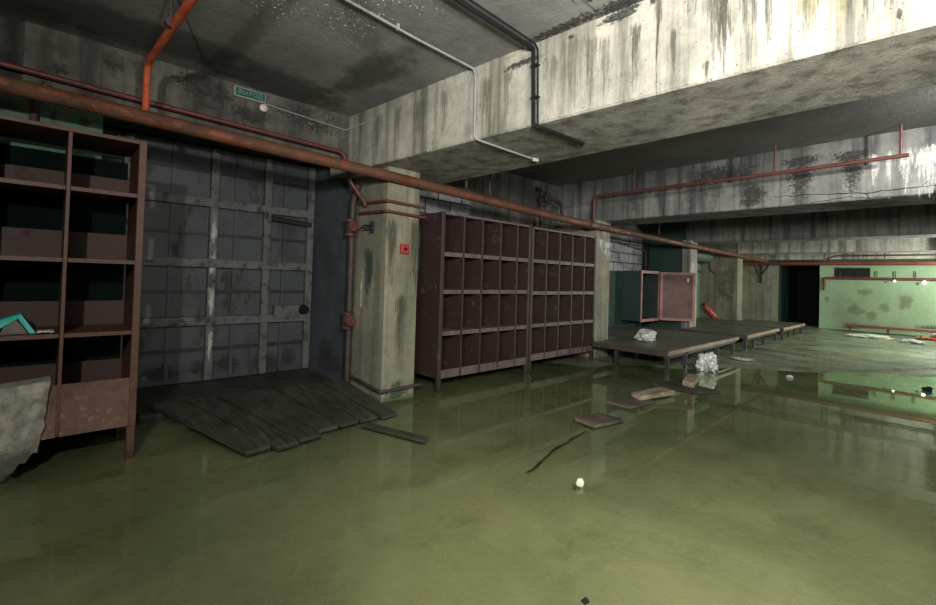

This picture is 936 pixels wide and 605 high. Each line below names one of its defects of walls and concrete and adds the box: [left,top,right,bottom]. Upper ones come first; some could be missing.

damp [504,54,541,72]
damp [520,0,662,51]
damp [630,25,641,68]
damp [707,0,731,44]
damp [743,0,818,39]
damp [688,165,771,207]
damp [781,145,936,199]